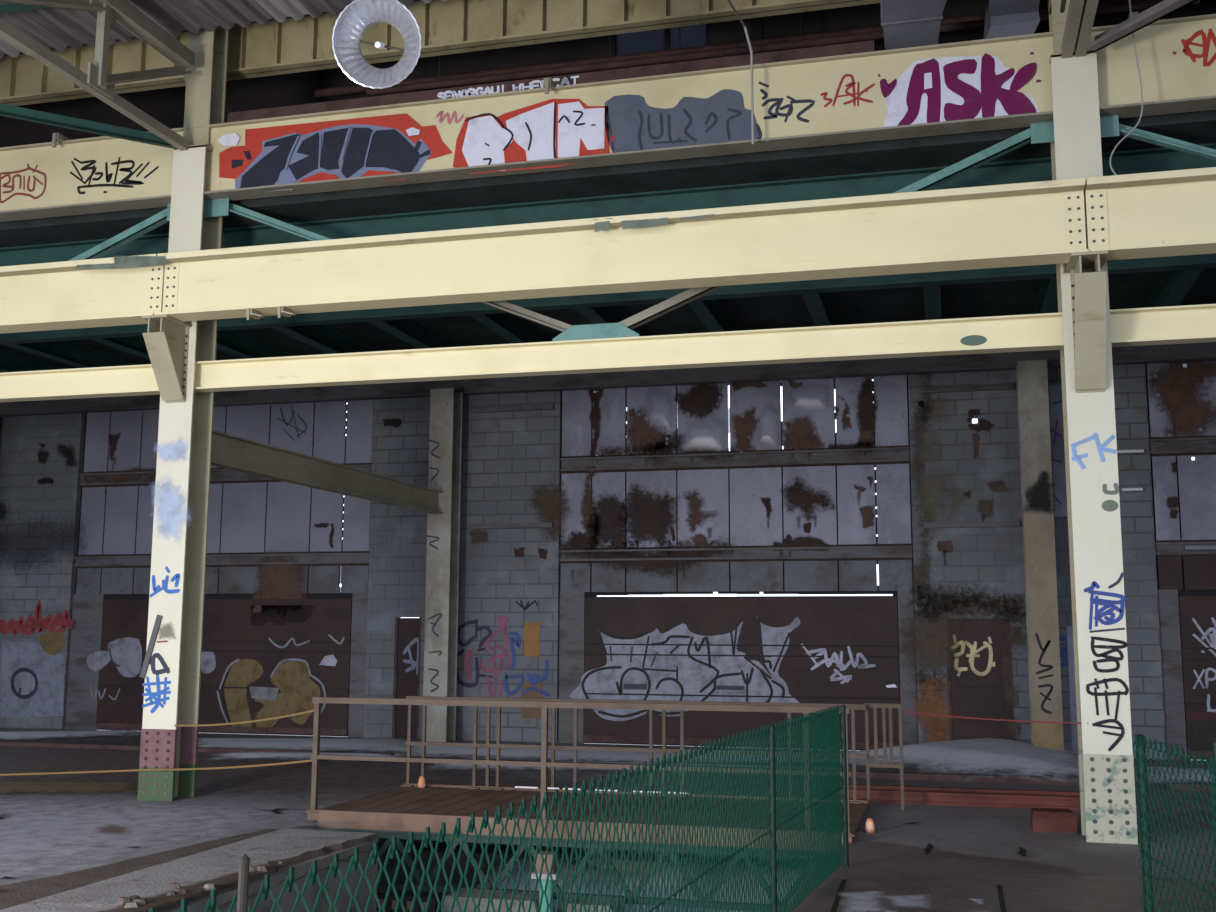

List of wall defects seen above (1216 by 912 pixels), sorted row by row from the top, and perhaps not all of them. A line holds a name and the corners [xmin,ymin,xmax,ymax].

corrosion [783,377,877,454]
corrosion [559,389,733,575]
corrosion [761,478,835,551]
corrosion [854,476,875,528]
corrosion [911,374,953,605]
corrosion [965,481,1008,517]
corrosion [253,552,305,614]
leakage [919,587,1026,620]
corrosion [914,677,950,742]